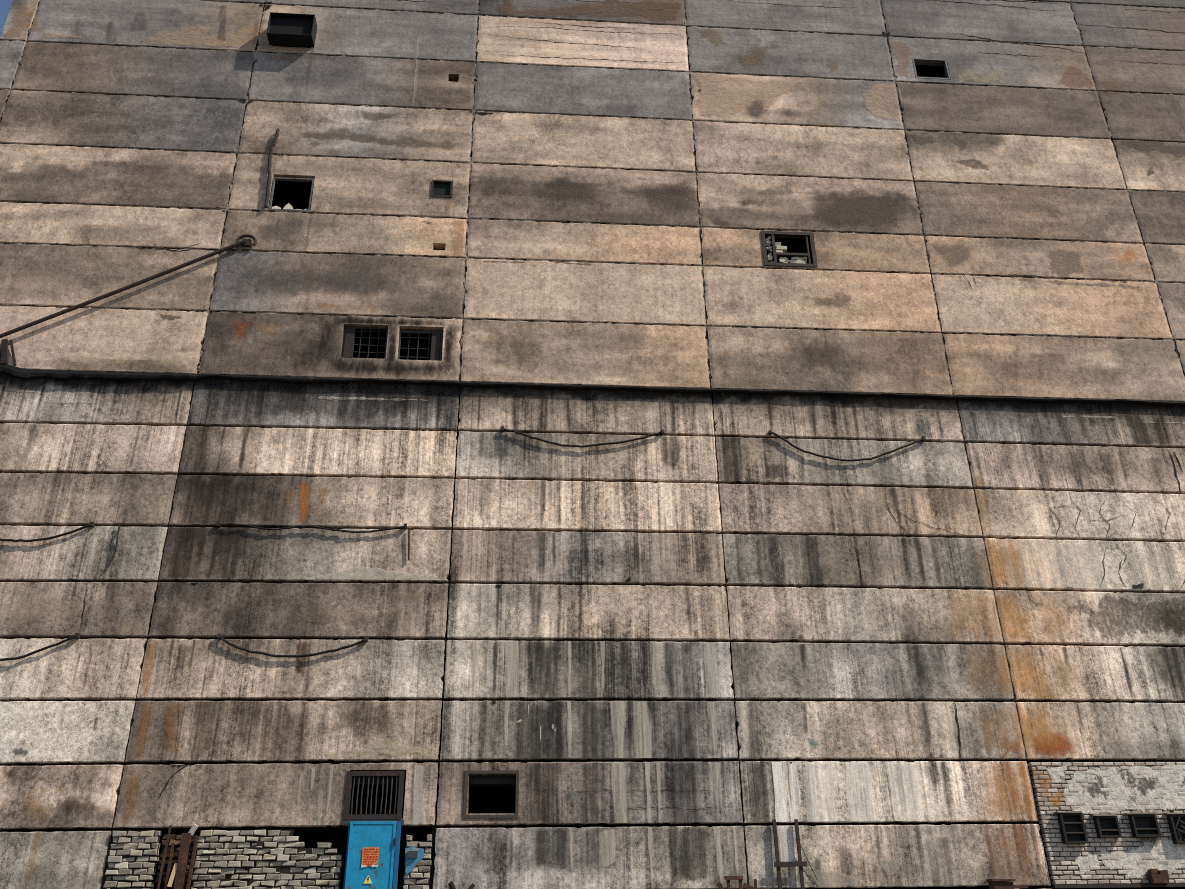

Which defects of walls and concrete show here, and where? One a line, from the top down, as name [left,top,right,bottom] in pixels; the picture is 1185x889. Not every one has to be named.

water stain [663,409,679,465]
crack [1039,450,1183,585]
water stain [1013,544,1185,699]
water stain [494,585,738,882]
corrosion [1005,713,1071,810]
peeling [1047,765,1185,814]
peeling [1075,837,1185,878]